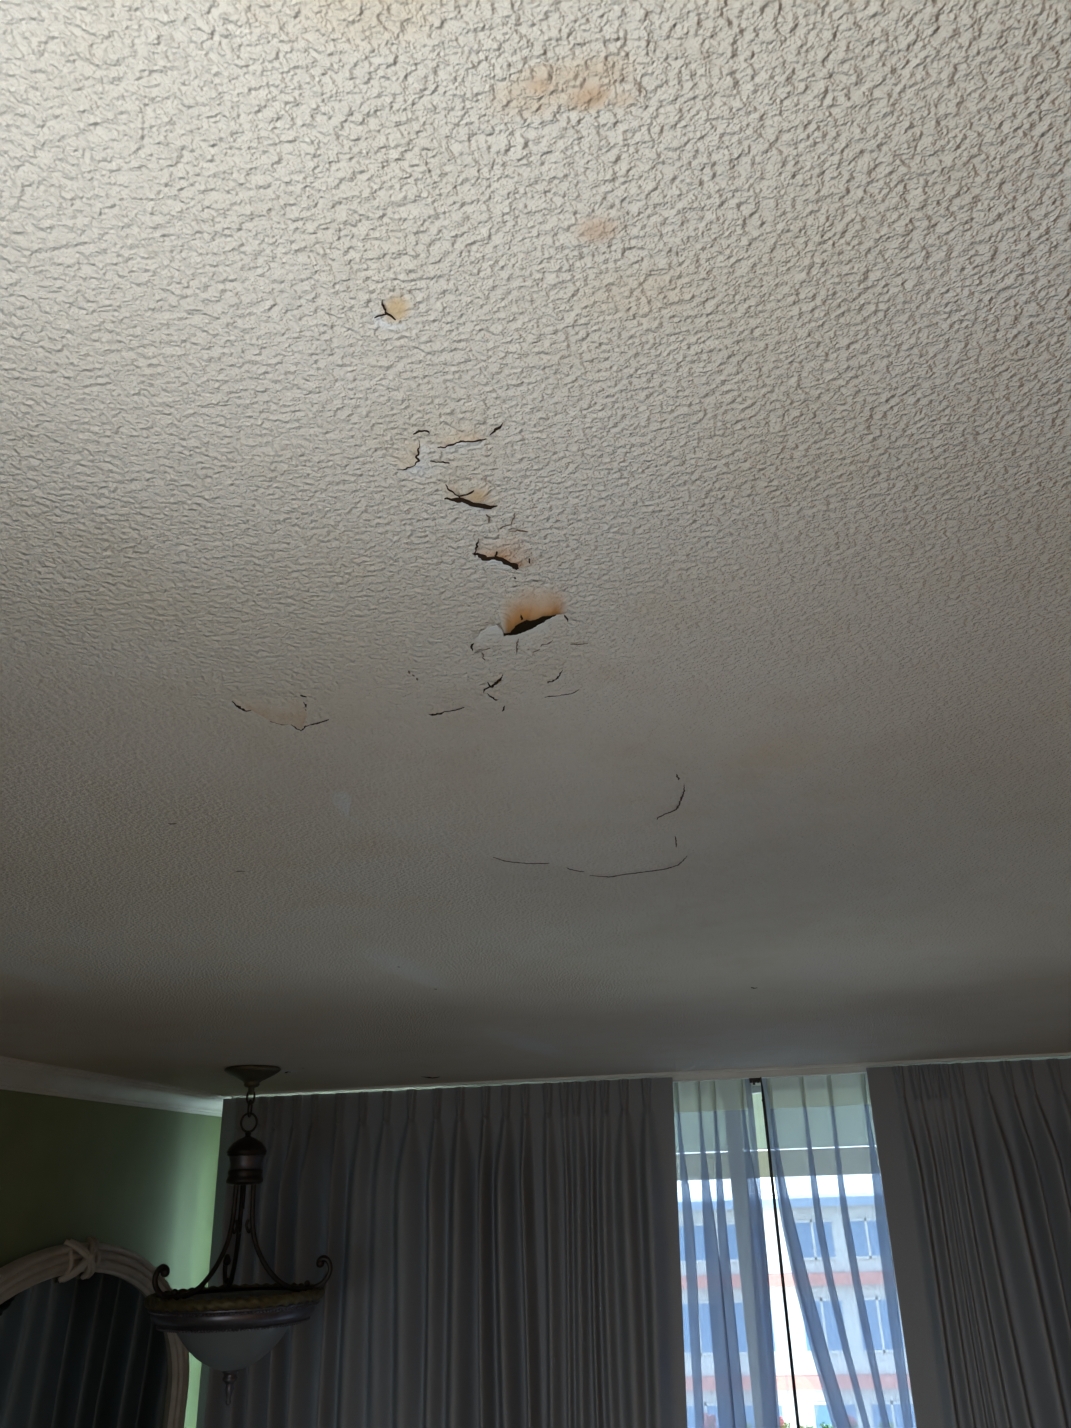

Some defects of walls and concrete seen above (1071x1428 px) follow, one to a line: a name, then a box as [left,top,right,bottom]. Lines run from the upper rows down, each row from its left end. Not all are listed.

peeling [384,422,550,579]
peeling [472,625,504,648]
crack [488,774,704,878]